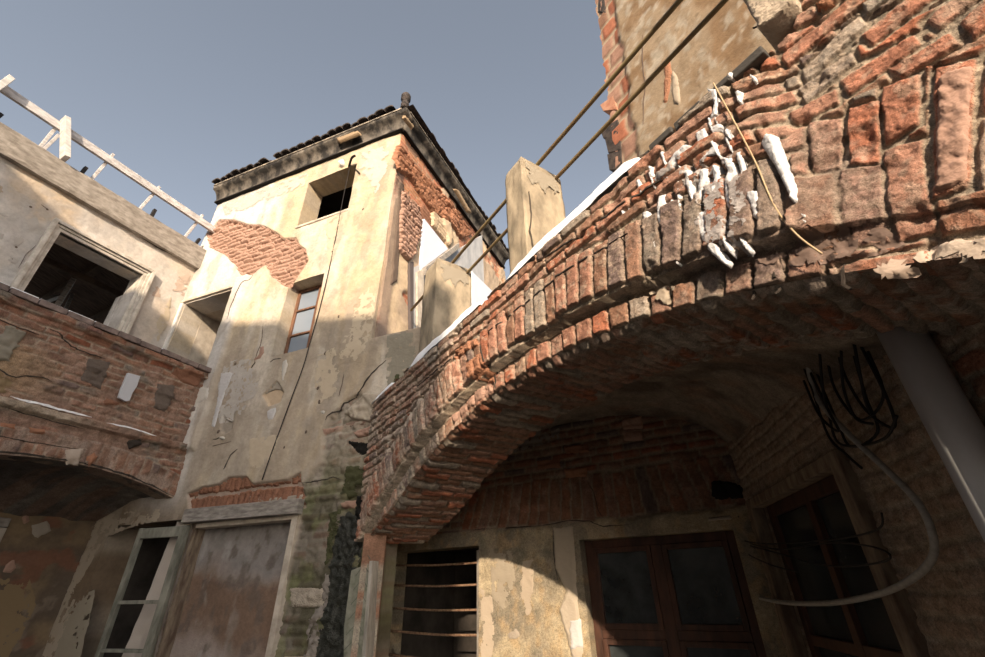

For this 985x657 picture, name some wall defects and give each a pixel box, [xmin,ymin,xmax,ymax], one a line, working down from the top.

water stain [617,89,748,247]
water stain [761,134,798,203]
peeling [391,144,473,262]
peeling [206,219,308,289]
crack [477,180,663,388]
water stain [699,211,906,269]
water stain [913,239,985,264]
crack [0,319,105,359]
crack [0,369,52,382]
spalling [265,360,288,394]
crack [325,360,386,420]
peeling [189,474,307,508]